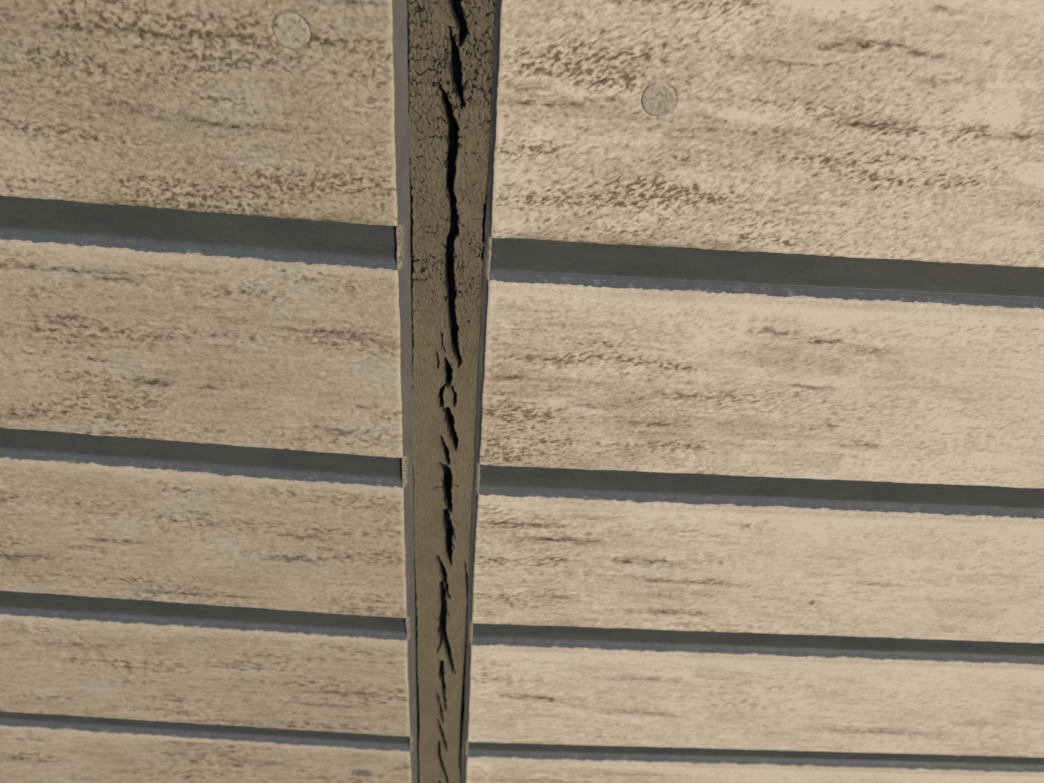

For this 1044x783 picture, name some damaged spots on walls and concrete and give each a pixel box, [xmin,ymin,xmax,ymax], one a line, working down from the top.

crack [408,0,495,783]